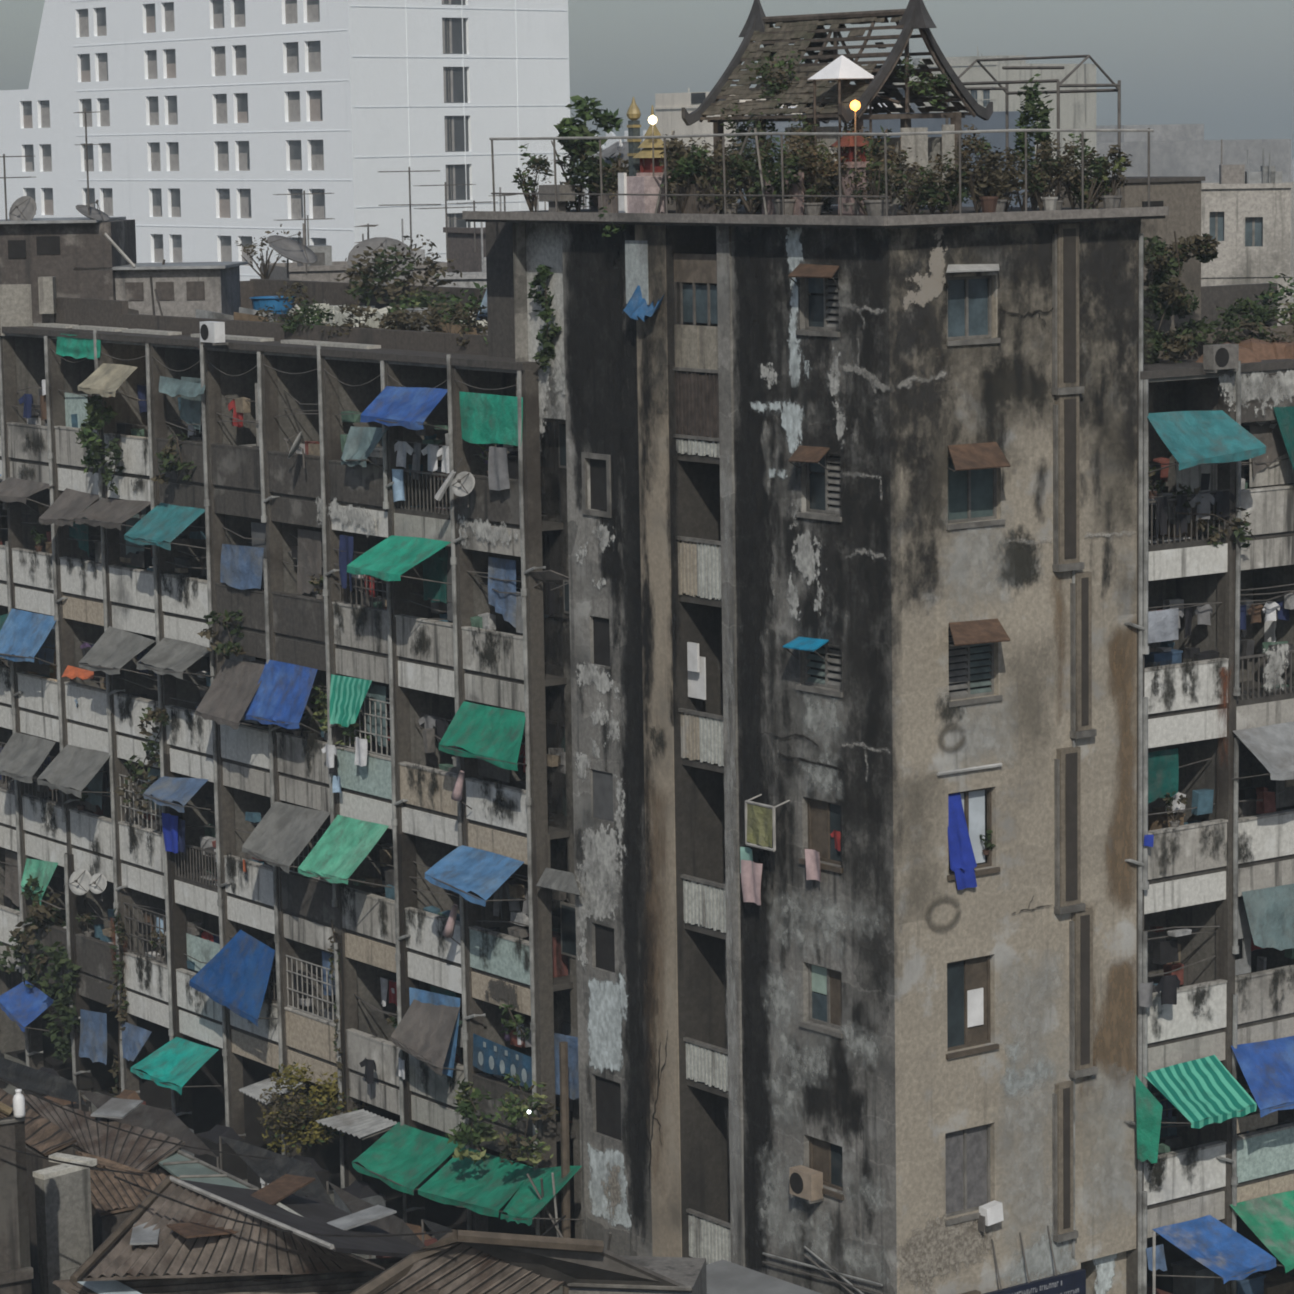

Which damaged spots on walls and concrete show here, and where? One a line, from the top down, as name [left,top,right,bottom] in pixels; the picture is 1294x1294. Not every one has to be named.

peeling [751,227,809,453]
peeling [1219,369,1294,415]
damp [333,604,381,653]
damp [410,628,431,654]
damp [540,224,679,1238]
damp [725,220,1146,1283]
peeling [575,774,628,1073]
peeling [588,1143,632,1229]